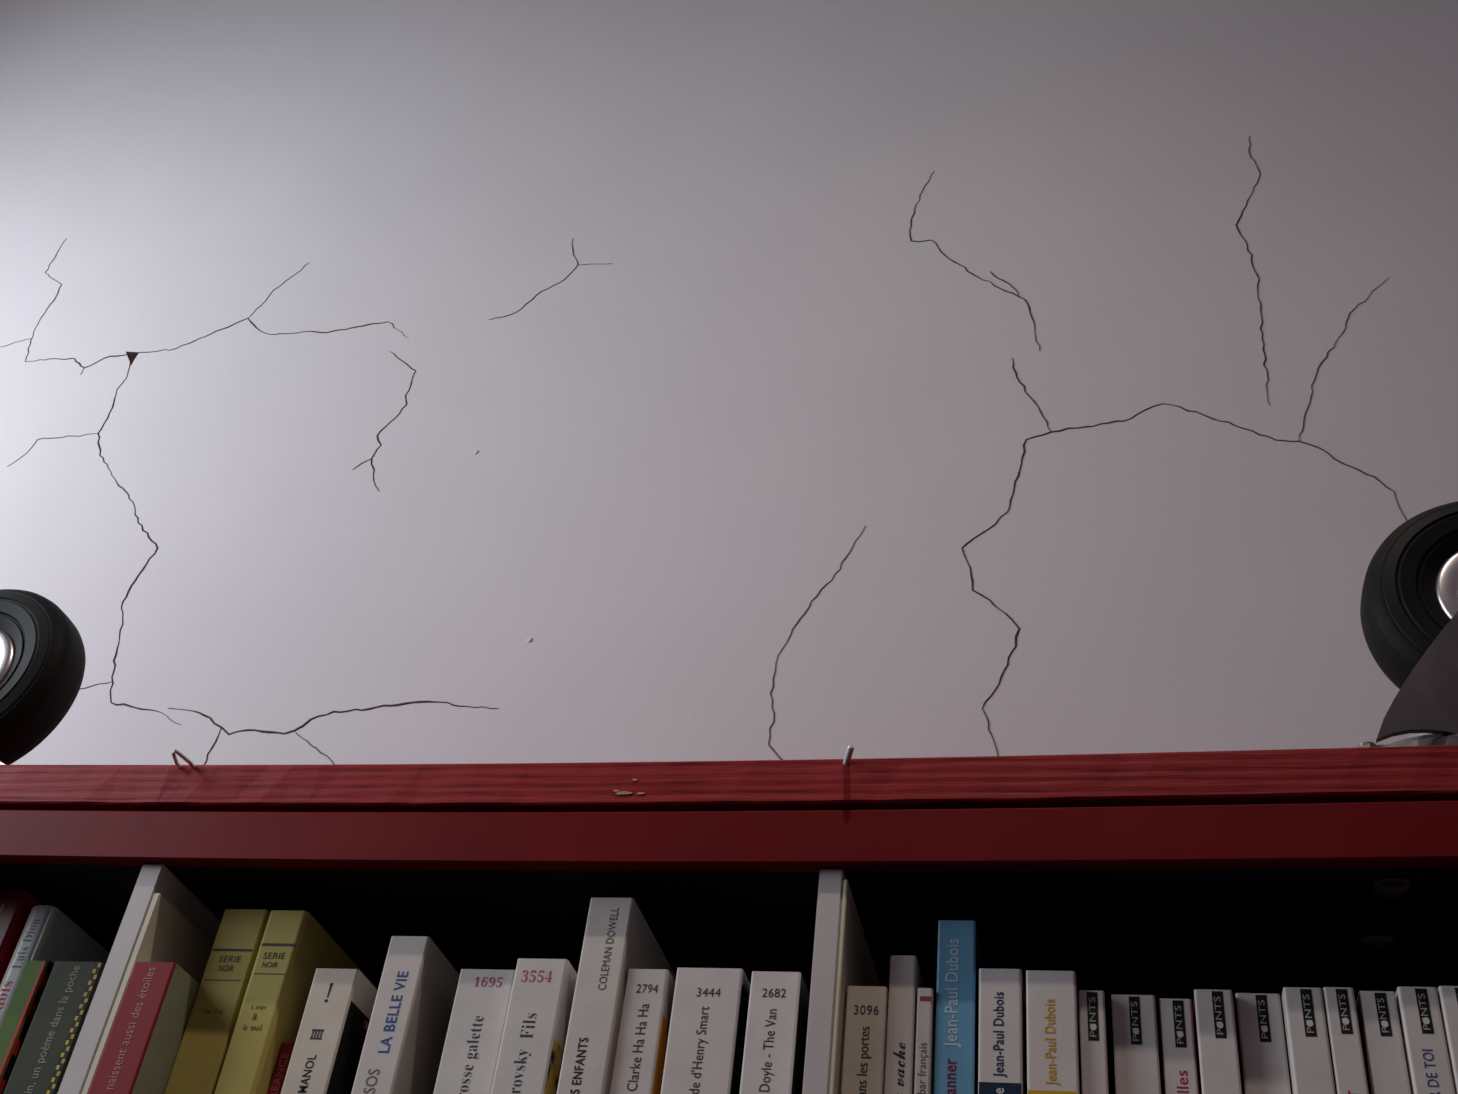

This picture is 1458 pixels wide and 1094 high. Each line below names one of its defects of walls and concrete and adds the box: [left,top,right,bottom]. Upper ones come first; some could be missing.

crack [1,238,498,765]
crack [489,238,613,320]
crack [768,525,866,760]
crack [909,136,1407,756]